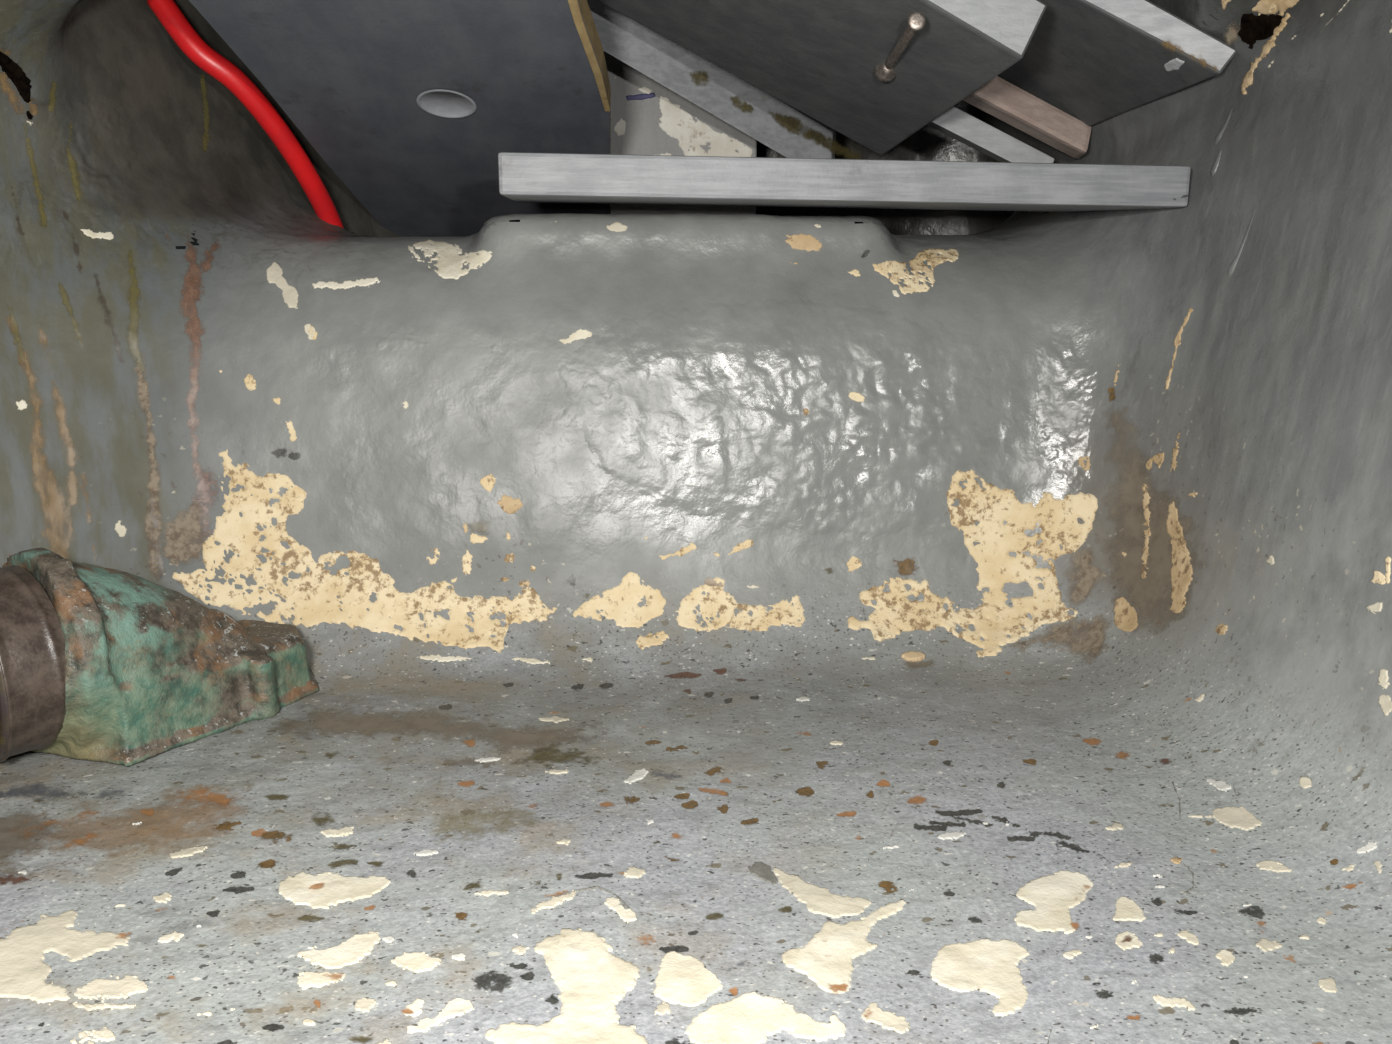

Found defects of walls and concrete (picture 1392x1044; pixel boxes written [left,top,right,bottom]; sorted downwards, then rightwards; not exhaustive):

crack [0,51,33,120]
peeling [1226,0,1299,95]
peeling [408,239,492,279]
rust [181,242,218,477]
peeling [172,450,557,664]
peeling [567,572,805,650]
peeling [847,469,1098,660]
damp [1020,616,1107,656]
damp [1070,413,1194,630]
peeling [0,910,148,1011]
peeling [485,928,846,1044]
peeling [930,870,1093,1017]